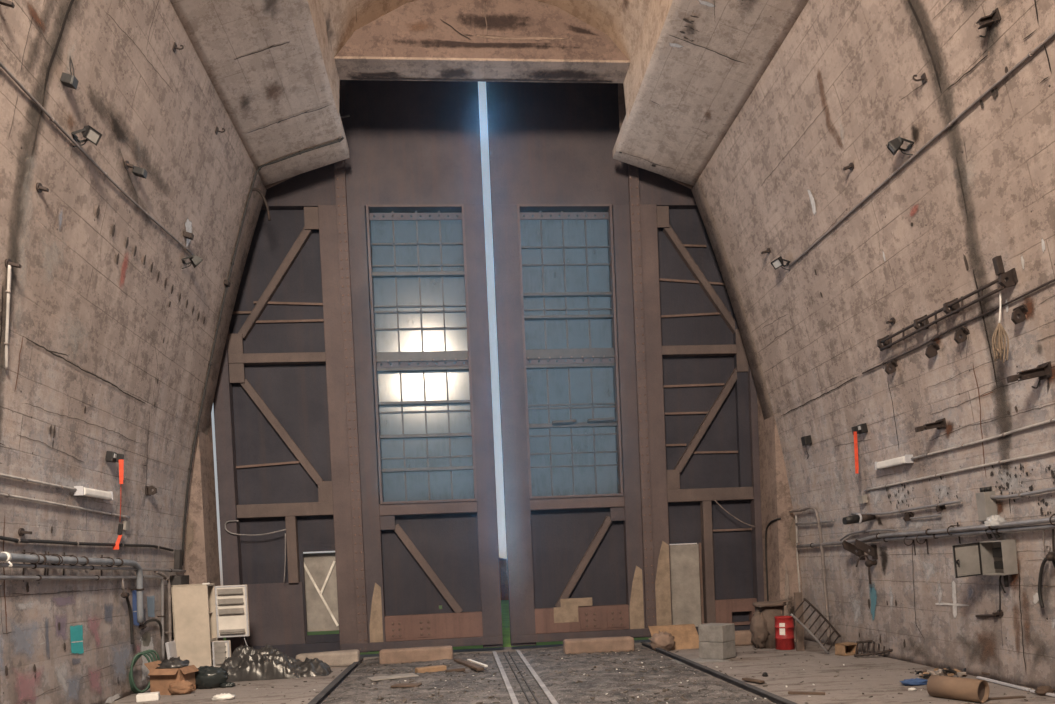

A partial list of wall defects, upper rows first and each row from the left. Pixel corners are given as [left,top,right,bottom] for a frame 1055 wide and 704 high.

water stain [0,0,79,385]
rust [817,71,842,147]
water stain [906,0,1011,472]
peeling [990,464,1055,516]